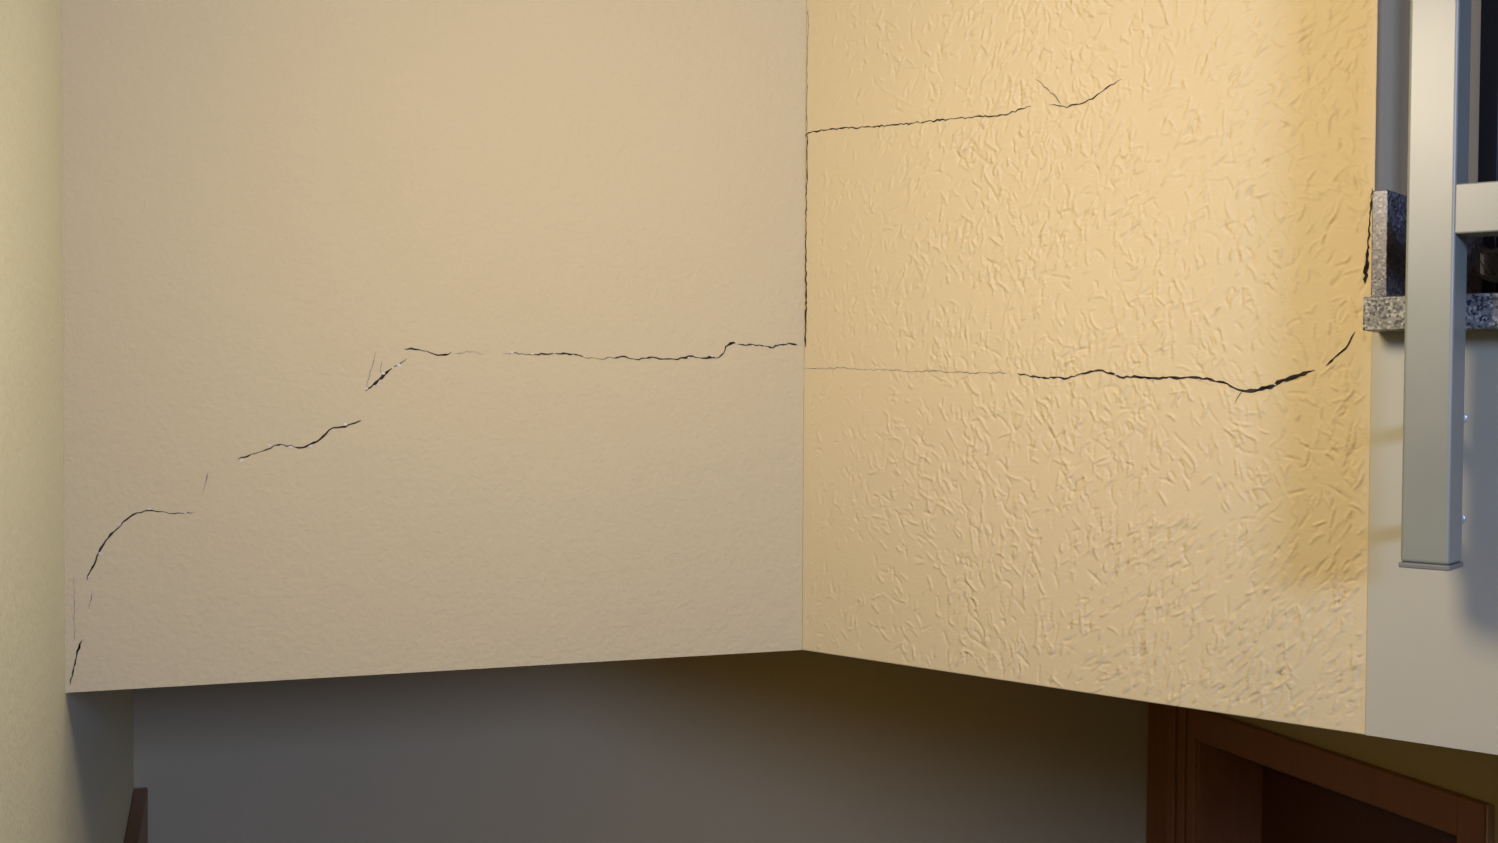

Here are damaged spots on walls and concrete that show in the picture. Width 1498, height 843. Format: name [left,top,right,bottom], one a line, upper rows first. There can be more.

crack [70,12,1355,684]